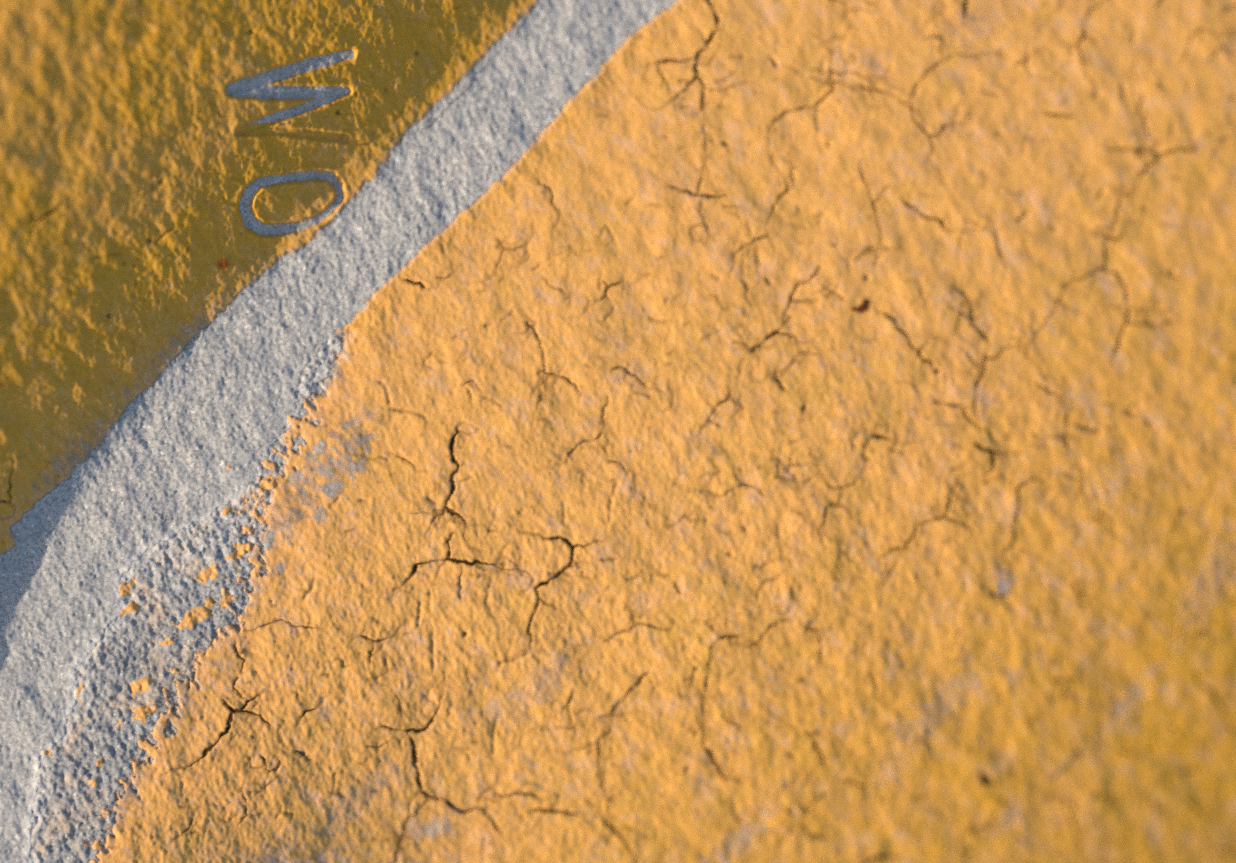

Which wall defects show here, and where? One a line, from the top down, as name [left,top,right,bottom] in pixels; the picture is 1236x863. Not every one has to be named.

crack [656,0,734,237]
crack [736,51,882,271]
peeling [0,0,676,863]
crack [404,277,447,288]
crack [403,380,598,644]
crack [526,321,646,473]
crack [751,266,820,392]
crack [723,424,900,581]
crack [878,94,1195,545]
crack [188,619,316,830]
crack [367,673,649,863]
crack [694,609,822,780]